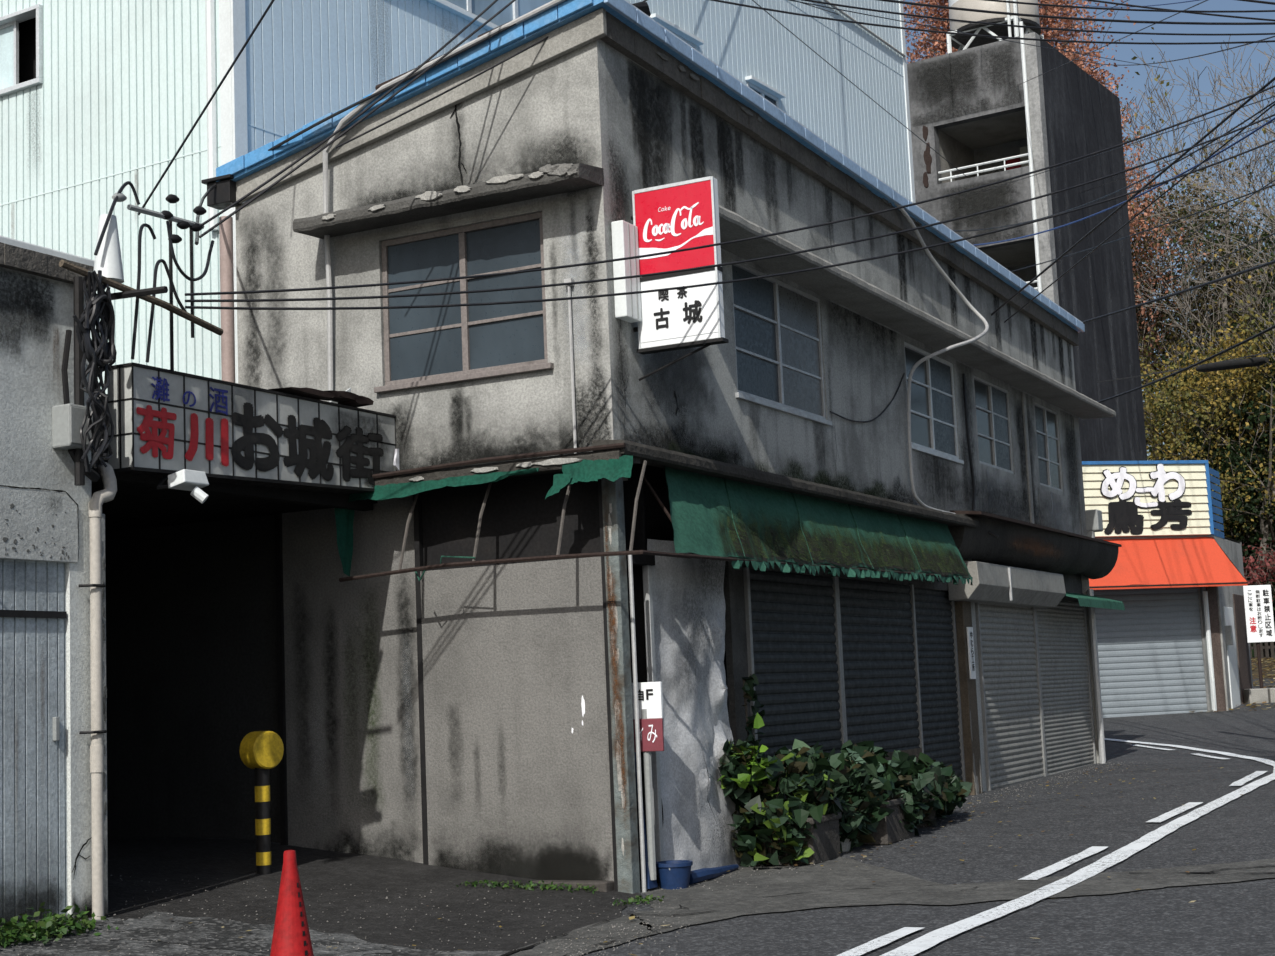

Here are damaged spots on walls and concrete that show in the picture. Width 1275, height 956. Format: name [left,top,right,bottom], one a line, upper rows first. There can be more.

crack [450,104,467,186]
leakage [610,150,628,221]
leakage [629,65,744,210]
leakage [587,216,599,343]
leakage [562,348,738,464]
corrosion [606,536,626,790]